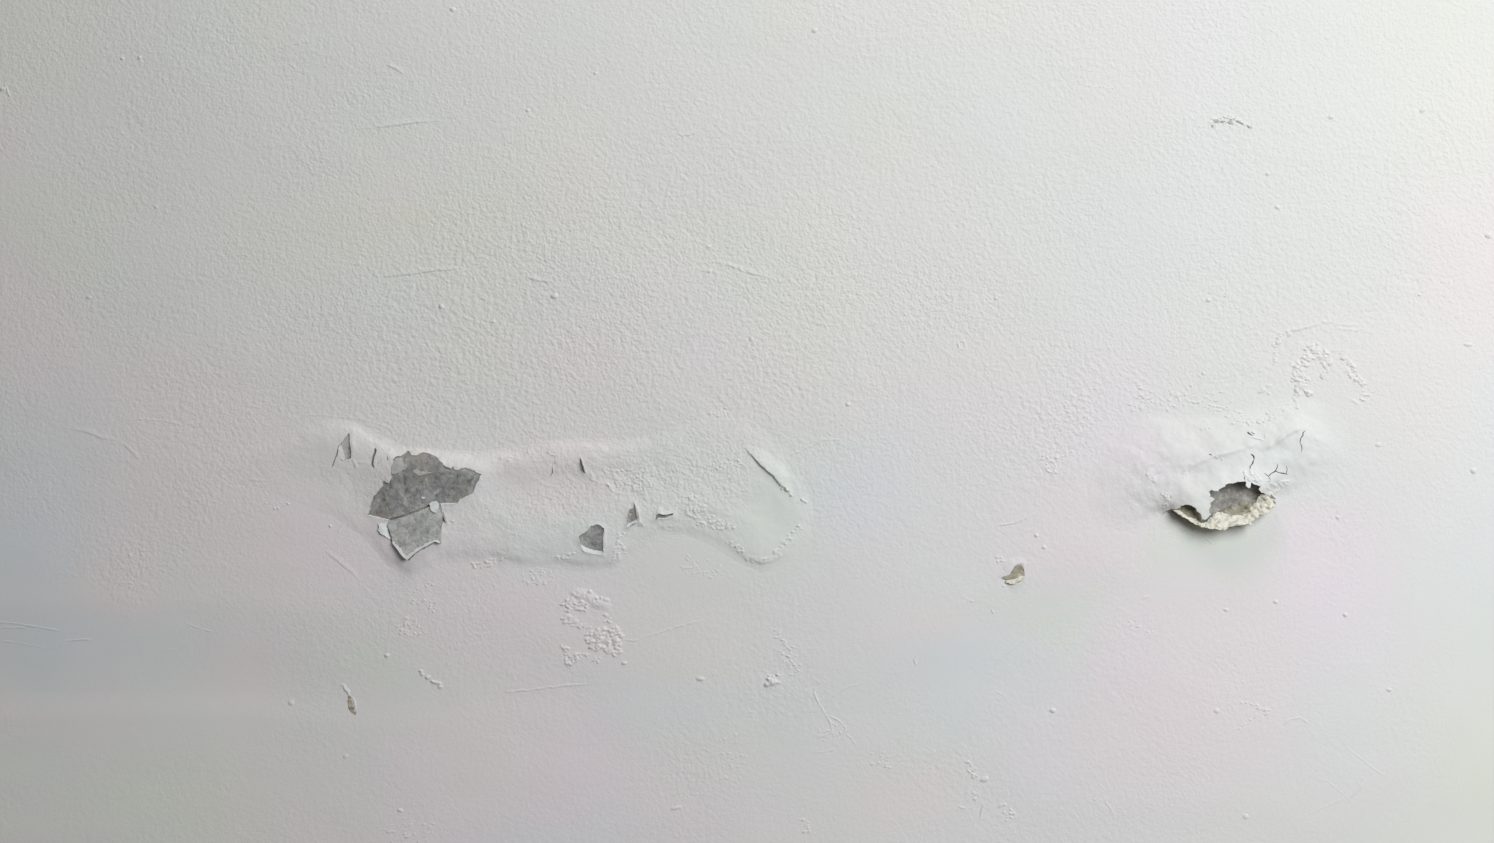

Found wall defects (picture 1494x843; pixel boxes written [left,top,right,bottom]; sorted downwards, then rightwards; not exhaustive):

peeling [367,451,481,560]
peeling [626,503,672,528]
peeling [579,524,608,555]
flaking render [995,555,1027,588]